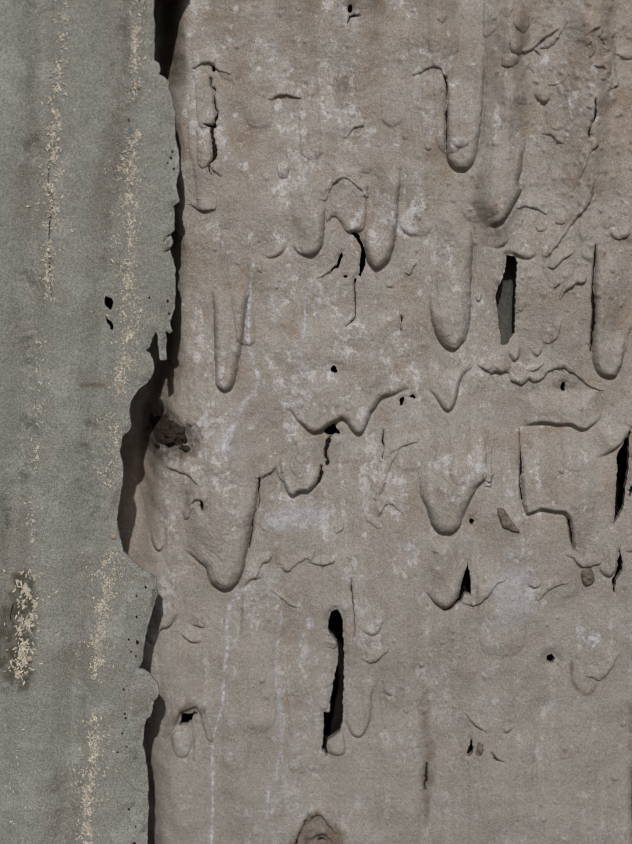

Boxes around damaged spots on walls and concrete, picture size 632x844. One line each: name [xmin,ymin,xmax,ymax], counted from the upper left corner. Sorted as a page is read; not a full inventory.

crack [204,79,218,174]
crack [589,246,597,351]
spalling [149,413,190,452]
damp [0,574,33,687]